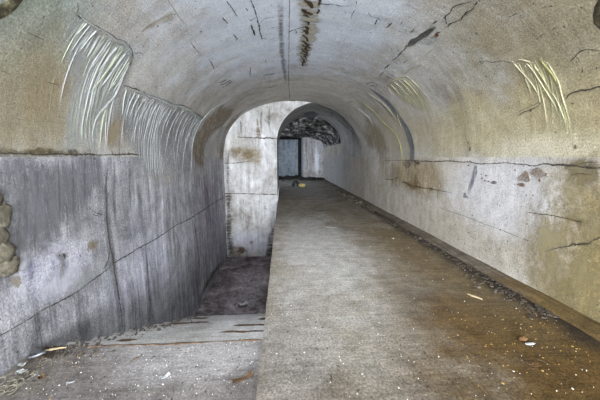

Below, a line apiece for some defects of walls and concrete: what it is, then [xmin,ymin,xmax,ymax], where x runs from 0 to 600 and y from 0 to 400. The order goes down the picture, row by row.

crack [433,2,477,27]
water stain [0,18,222,254]
water stain [368,62,426,160]
crack [385,160,600,169]
spalling [514,167,549,187]
water stain [512,59,573,142]
crack [566,86,600,104]
spalling [0,192,28,303]
crack [0,150,277,336]
crack [545,237,600,252]